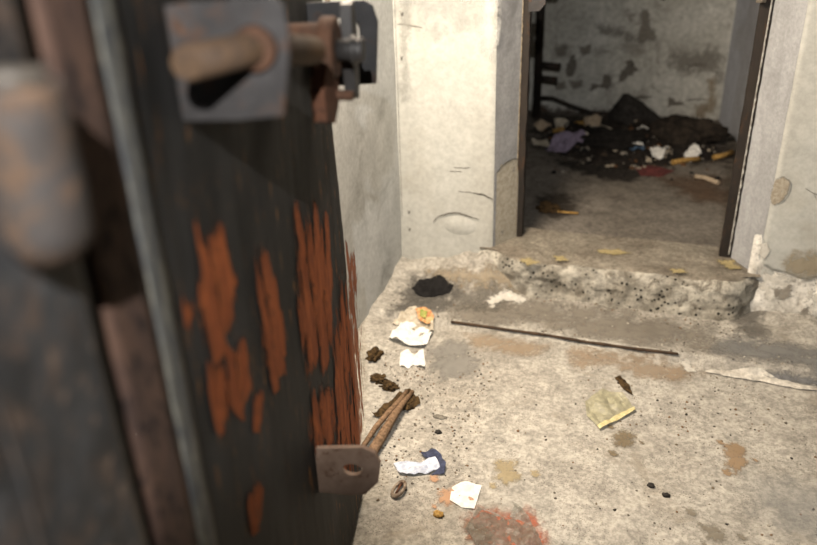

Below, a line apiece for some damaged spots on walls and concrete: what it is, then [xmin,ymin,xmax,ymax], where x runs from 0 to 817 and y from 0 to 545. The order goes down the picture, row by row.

damp [639,10,656,43]
damp [669,51,723,82]
spalling [718,234,817,317]
damp [450,283,817,385]
damp [426,339,476,380]